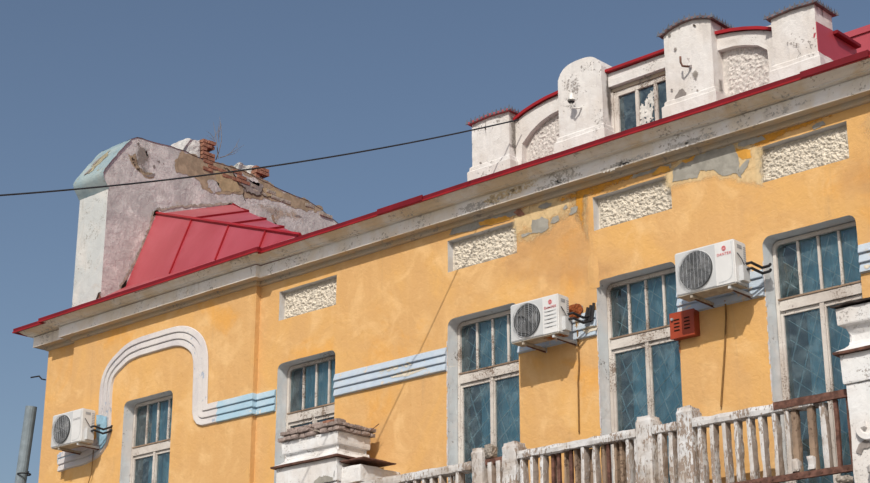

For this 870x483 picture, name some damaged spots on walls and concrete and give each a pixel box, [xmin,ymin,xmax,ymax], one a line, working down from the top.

flaking render [128,142,164,179]
peeling [600,153,650,173]
peeling [632,115,831,187]
flaking render [119,150,323,290]
peeling [449,173,587,242]